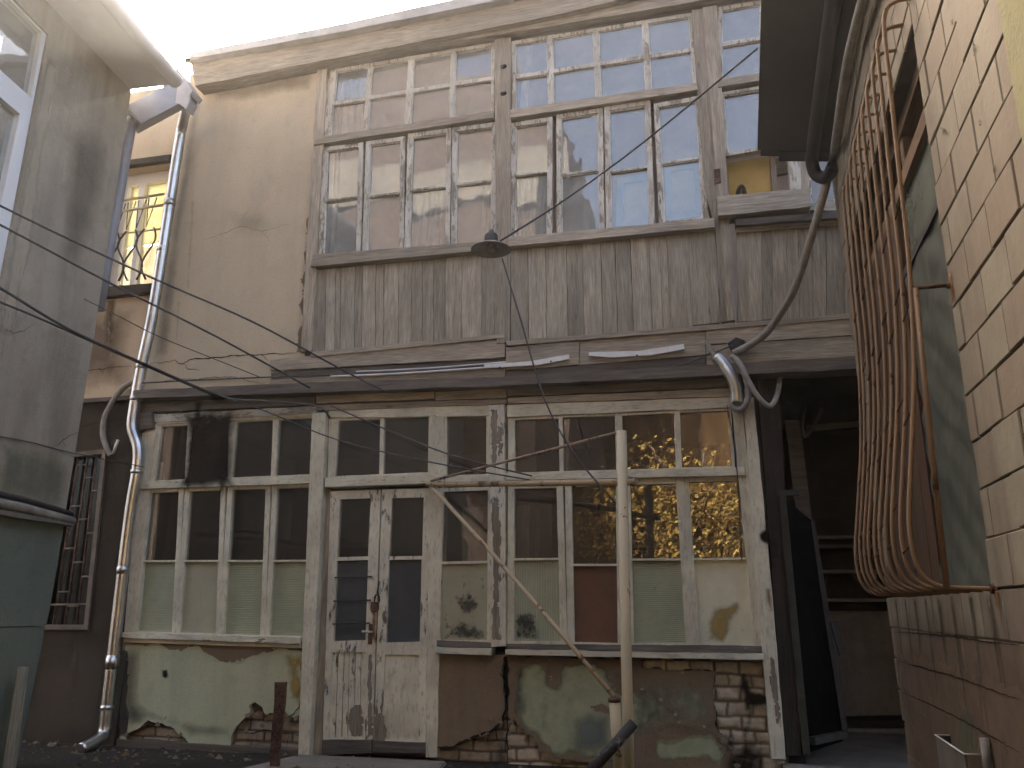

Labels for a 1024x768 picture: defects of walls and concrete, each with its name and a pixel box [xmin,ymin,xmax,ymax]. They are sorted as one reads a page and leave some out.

crack [88,353,288,384]
peeling [165,639,299,663]
spalling [119,655,187,741]
spalling [235,703,299,748]
crack [437,663,509,764]
spalling [431,711,590,767]
spalling [606,657,787,768]